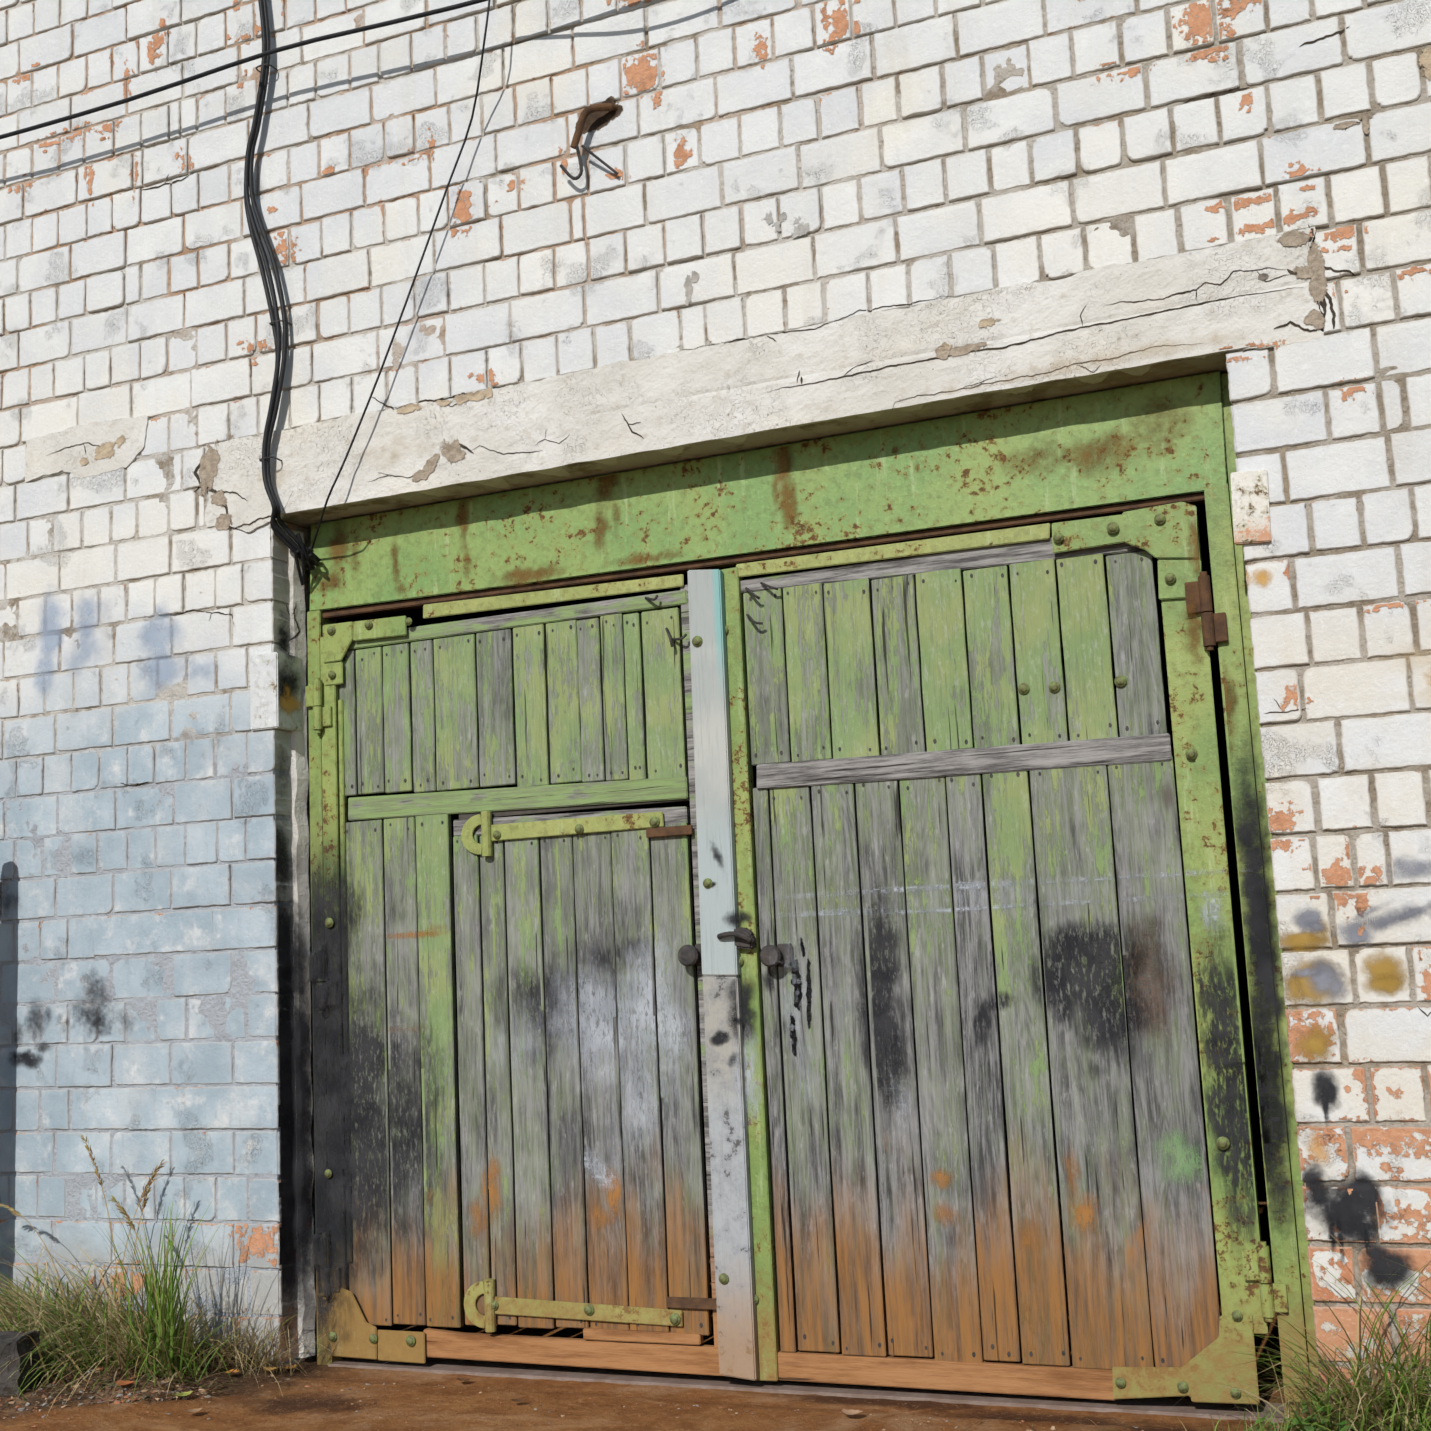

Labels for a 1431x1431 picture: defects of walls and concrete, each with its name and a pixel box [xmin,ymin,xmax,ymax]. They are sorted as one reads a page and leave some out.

peeling [1172,0,1262,63]
spalling [1204,160,1369,330]
crack [682,296,950,351]
crack [772,225,1355,419]
crack [51,438,128,454]
crack [193,449,271,530]
rust [457,502,467,532]
rust [775,446,796,522]
rust [1192,524,1200,570]
water stain [276,824,292,883]
peeling [1302,825,1383,936]
peeling [1316,1115,1431,1195]